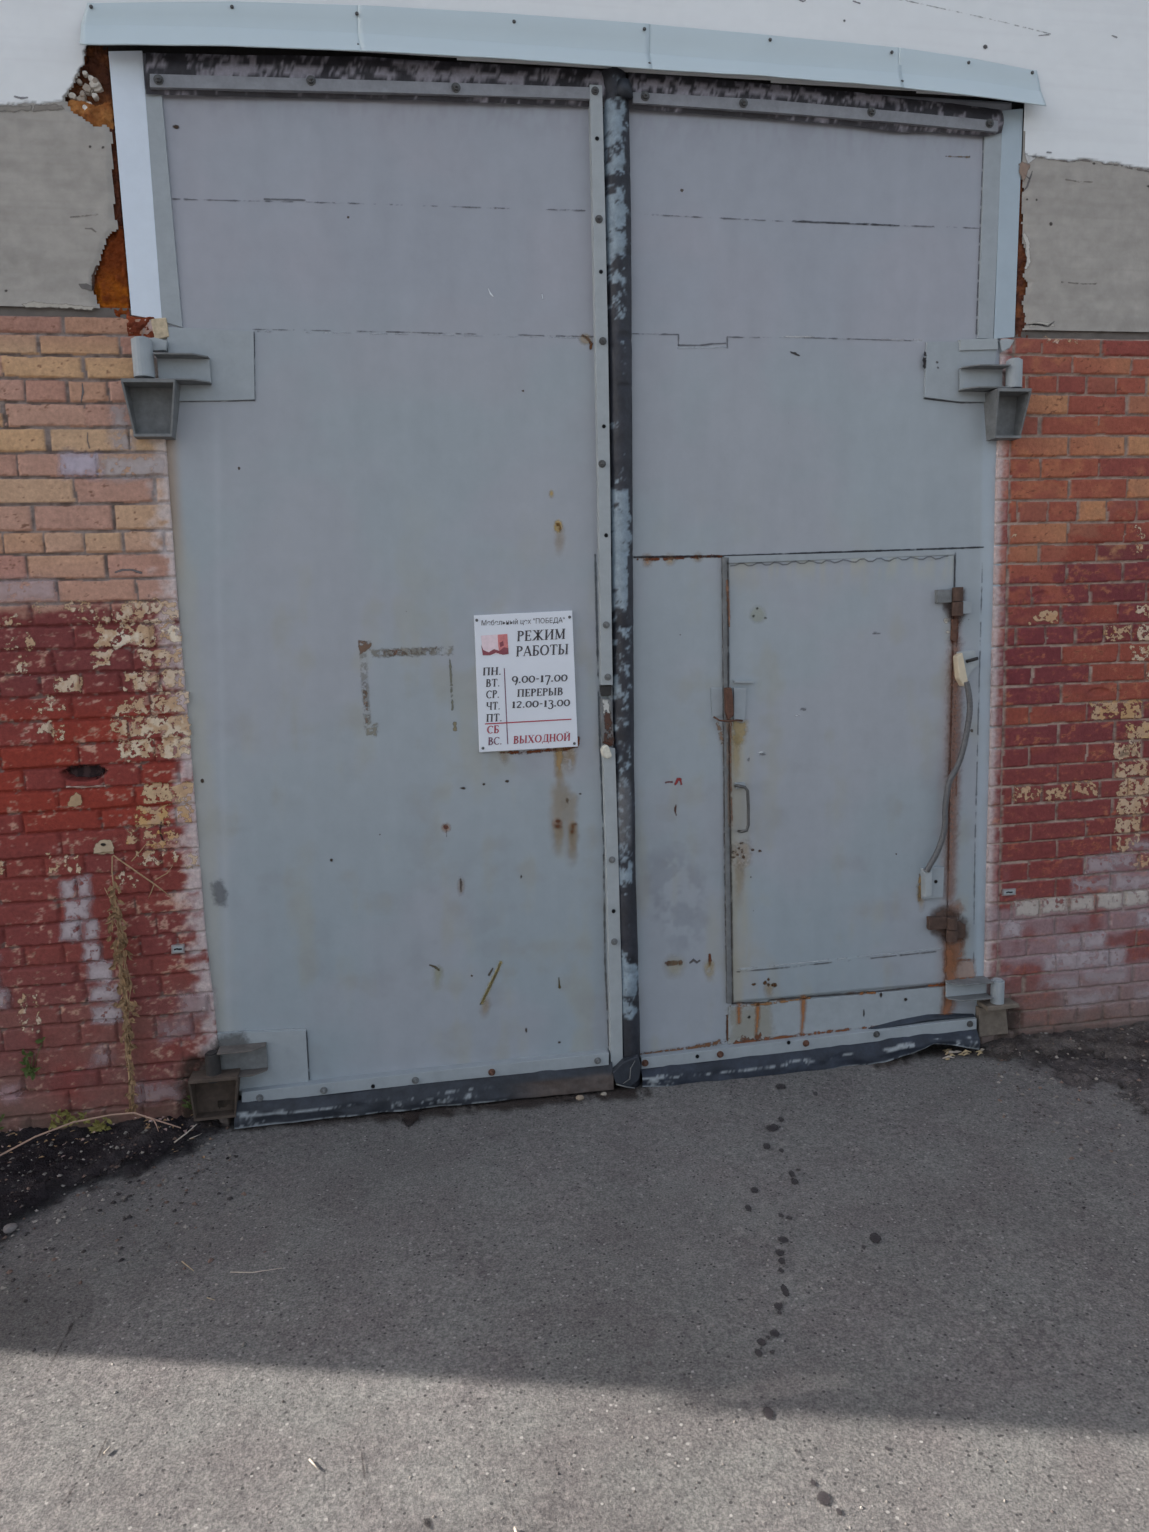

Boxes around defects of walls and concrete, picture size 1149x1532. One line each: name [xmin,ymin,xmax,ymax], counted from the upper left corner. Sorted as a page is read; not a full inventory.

spalling [0,45,155,338]
spalling [1015,152,1149,344]
peeling [2,597,191,762]
peeling [1028,610,1058,625]
peeling [1103,604,1149,680]
peeling [46,853,81,873]
spalling [66,765,107,779]
peeling [118,779,204,894]
rust [918,590,975,1015]
peeling [1012,779,1098,802]
peeling [1087,700,1149,870]
rust [640,978,882,1055]